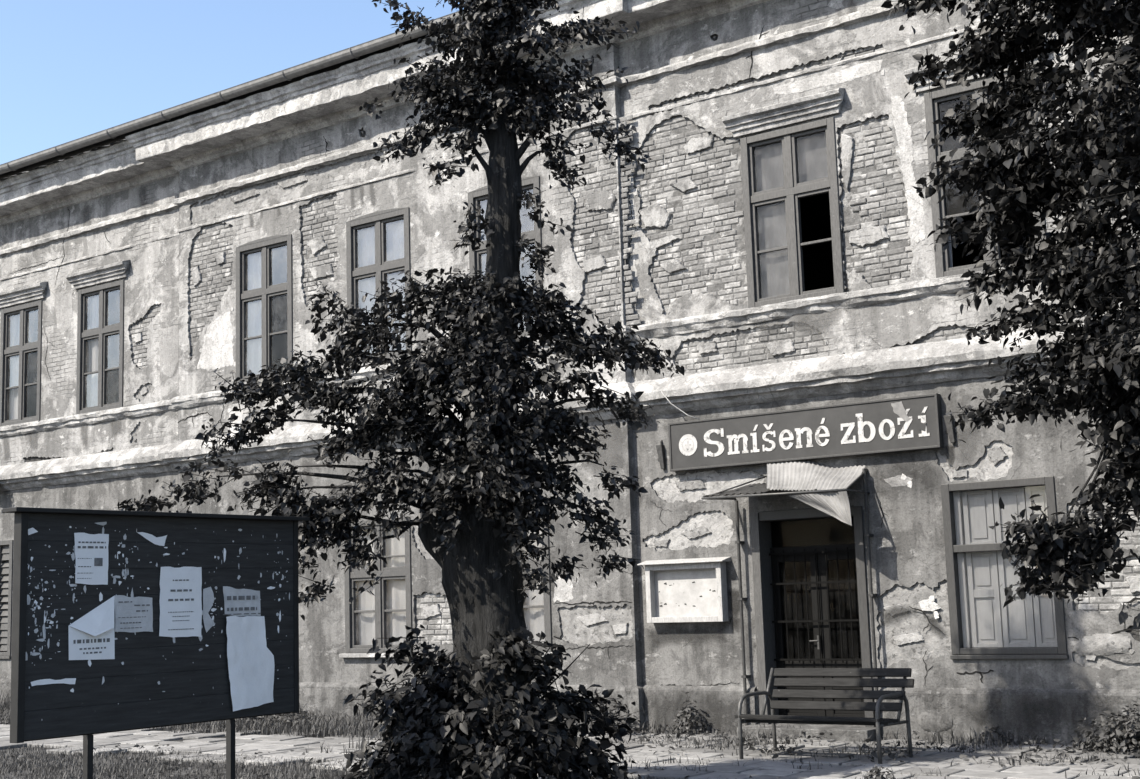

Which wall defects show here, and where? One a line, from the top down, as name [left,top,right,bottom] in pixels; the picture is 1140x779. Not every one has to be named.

flaking render [563,44,885,328]
flaking render [838,93,926,292]
flaking render [189,151,385,371]
flaking render [130,304,161,368]
flaking render [673,322,830,374]
flaking render [894,324,989,347]
flaking render [936,440,1014,482]
flaking render [644,470,766,552]
flaking render [1067,489,1140,614]
flaking render [553,574,637,646]
flaking render [1073,651,1140,670]
flaking render [1124,625,1140,642]